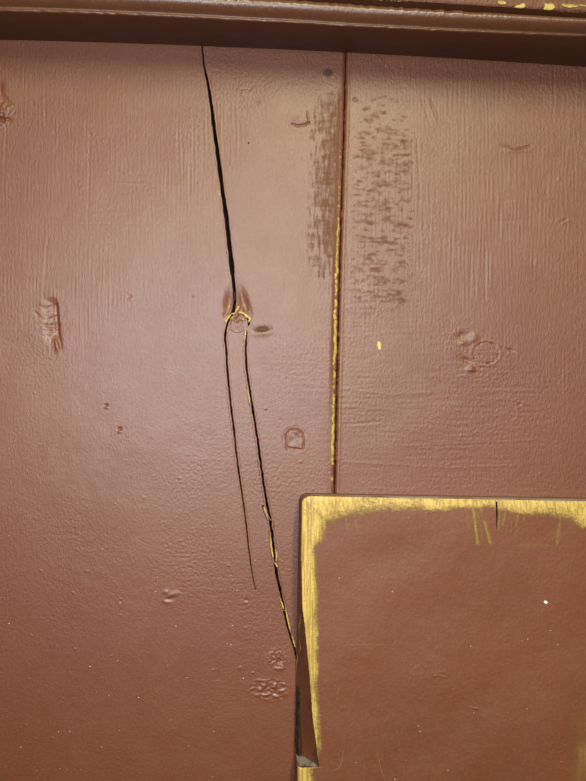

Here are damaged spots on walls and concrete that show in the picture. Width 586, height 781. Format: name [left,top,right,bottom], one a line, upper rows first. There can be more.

peeling [543,1,585,13]
crack [200,46,297,663]